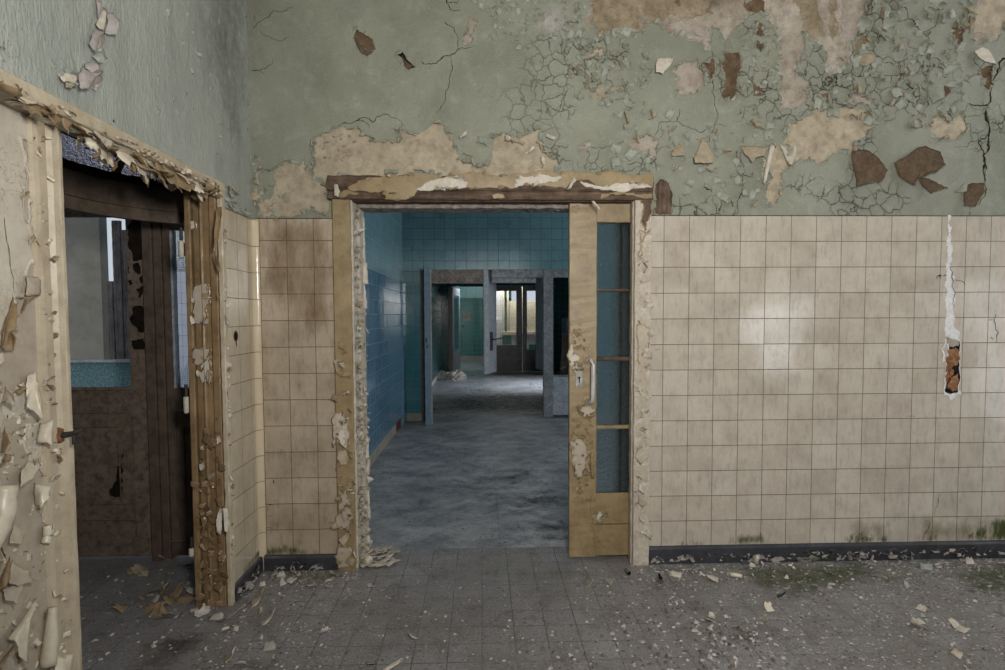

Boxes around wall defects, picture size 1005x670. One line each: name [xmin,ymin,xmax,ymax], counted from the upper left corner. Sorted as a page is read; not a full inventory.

peeling [56,4,109,91]
peeling [76,131,220,202]
crack [342,114,402,128]
peeling [249,120,564,221]
crack [422,0,471,113]
peeling [925,110,969,145]
peeling [950,0,1005,48]
crack [968,57,1005,205]
peeling [977,63,997,92]
peeling [0,135,70,670]
spalling [941,336,961,400]
peeling [138,283,401,622]